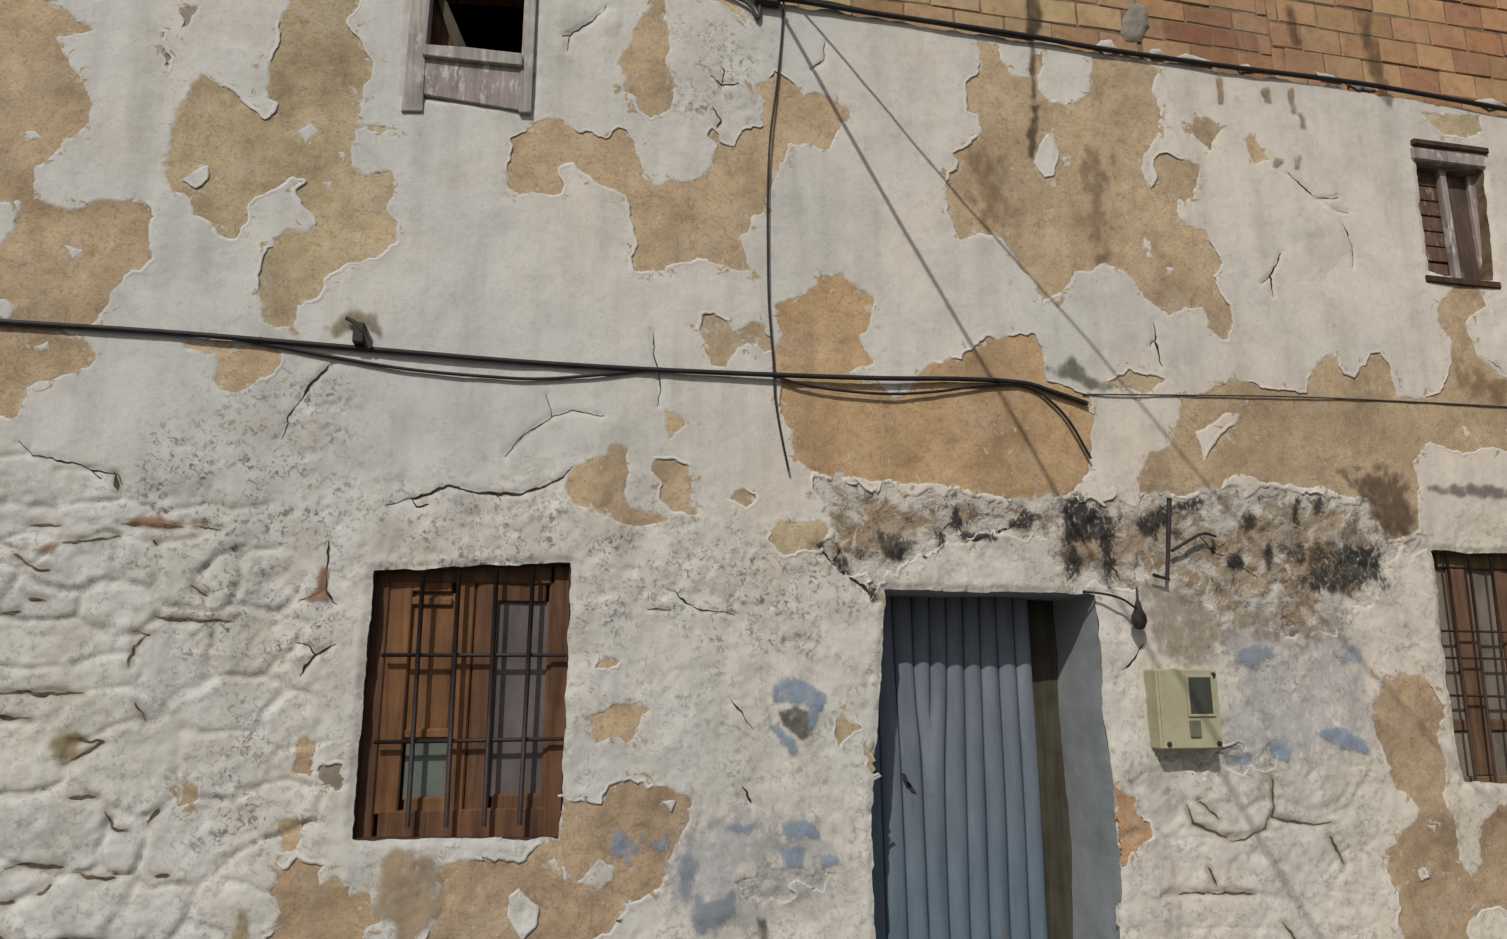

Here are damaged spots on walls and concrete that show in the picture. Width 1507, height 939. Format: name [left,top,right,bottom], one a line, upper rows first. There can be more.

damp [1027,0,1041,156]
peeling [0,0,159,423]
peeling [165,0,401,327]
peeling [505,69,850,276]
peeling [942,41,1234,344]
crack [282,363,332,437]
crack [385,396,604,507]
damp [833,547,849,573]
damp [939,505,998,548]
damp [1063,539,1082,583]
spalling [696,275,1507,643]
damp [1099,534,1117,579]